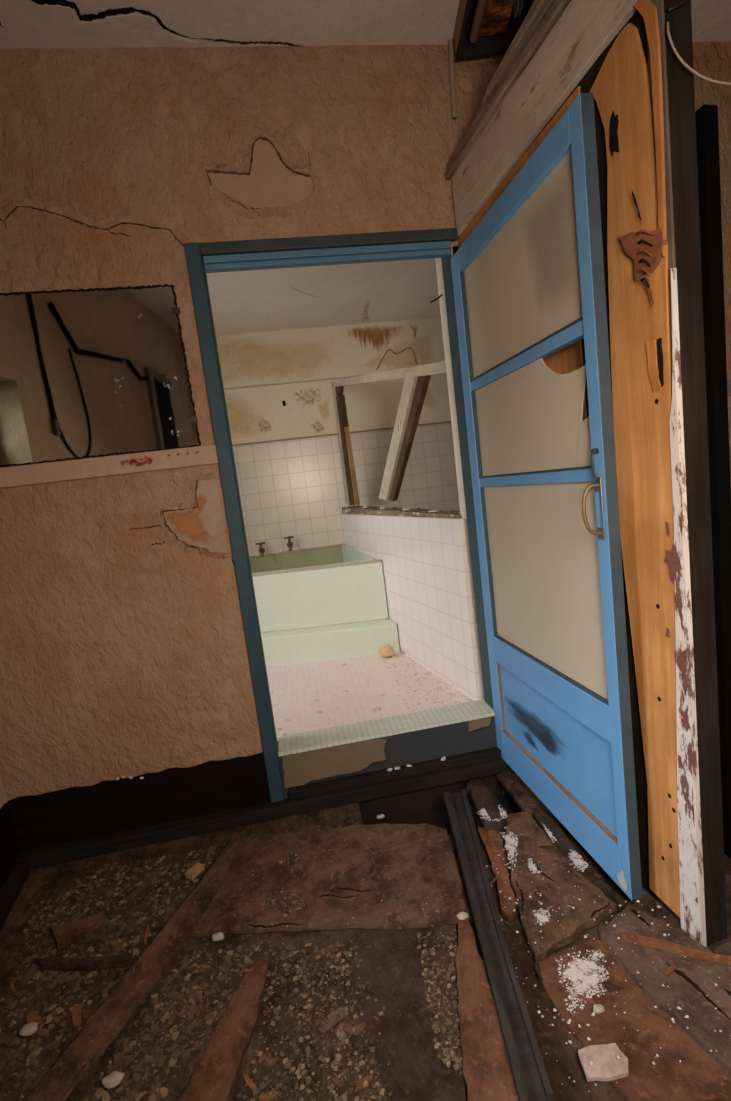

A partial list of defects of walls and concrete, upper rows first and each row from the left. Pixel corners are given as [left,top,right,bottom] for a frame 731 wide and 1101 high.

crack [0,0,300,47]
crack [0,197,190,247]
flaking render [126,472,234,564]
peeling [664,516,683,583]
peeling [666,596,684,637]
peeling [674,650,691,731]
peeling [678,748,694,820]